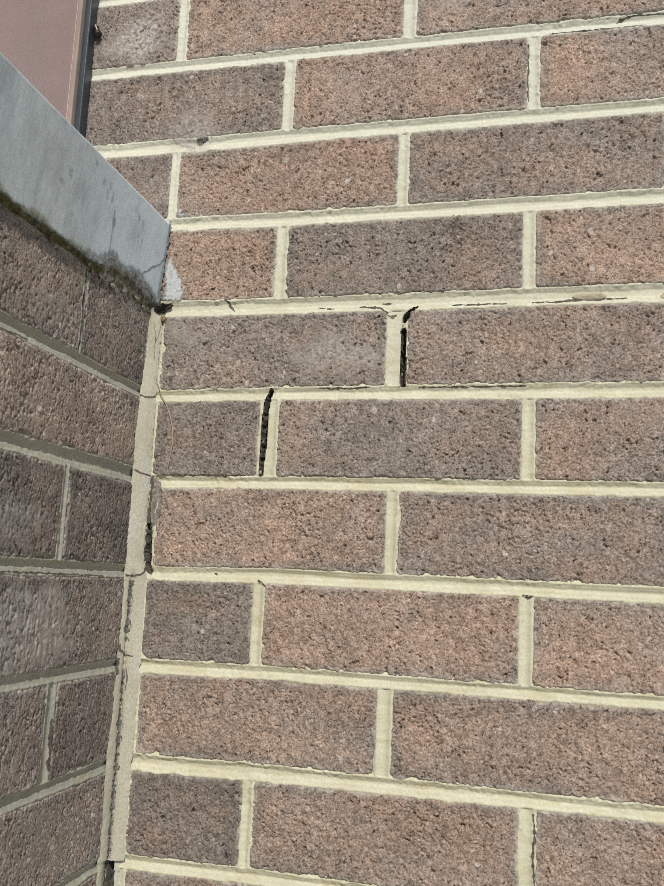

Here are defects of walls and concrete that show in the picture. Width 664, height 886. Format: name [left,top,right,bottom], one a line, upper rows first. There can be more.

crack [452,300,507,308]
crack [532,296,627,304]
crack [360,303,526,388]
crack [320,384,370,392]
crack [0,569,104,577]
crack [107,388,274,858]
crack [46,719,54,772]